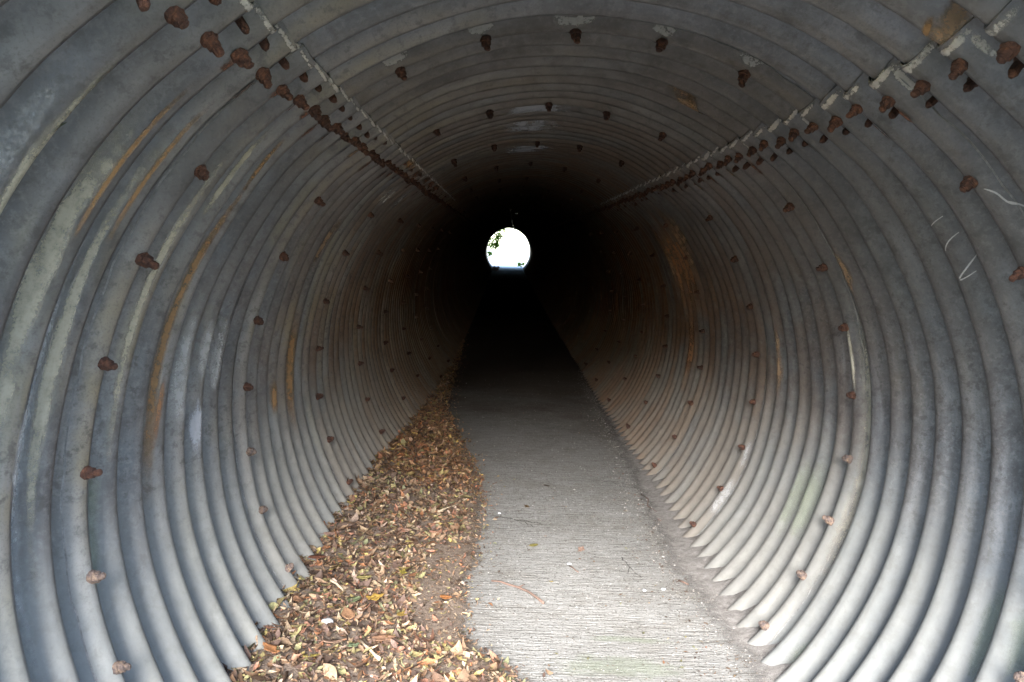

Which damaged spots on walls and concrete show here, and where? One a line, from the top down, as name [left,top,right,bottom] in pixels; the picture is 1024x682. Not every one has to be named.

rust [240,0,455,207]
rust [589,1,1015,217]
rust [145,217,225,456]